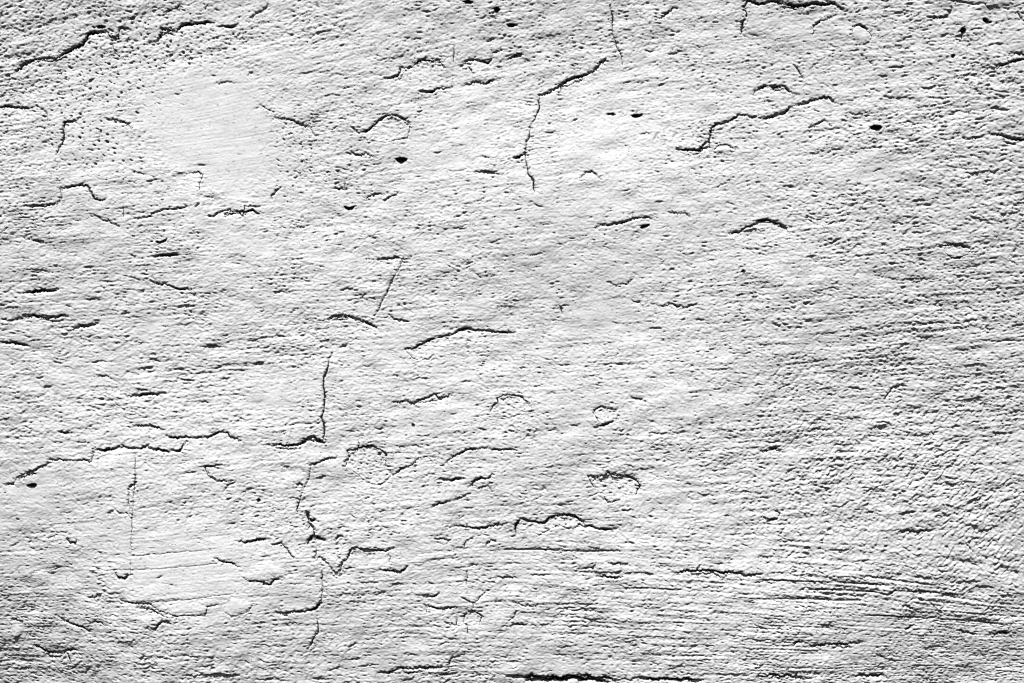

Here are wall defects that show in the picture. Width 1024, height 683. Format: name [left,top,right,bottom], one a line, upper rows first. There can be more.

crack [13,5,267,73]
crack [741,0,844,33]
crack [516,7,623,191]
crack [677,65,835,155]
crack [328,257,410,328]
crack [7,424,241,485]
crack [205,465,233,492]
crack [213,352,341,648]